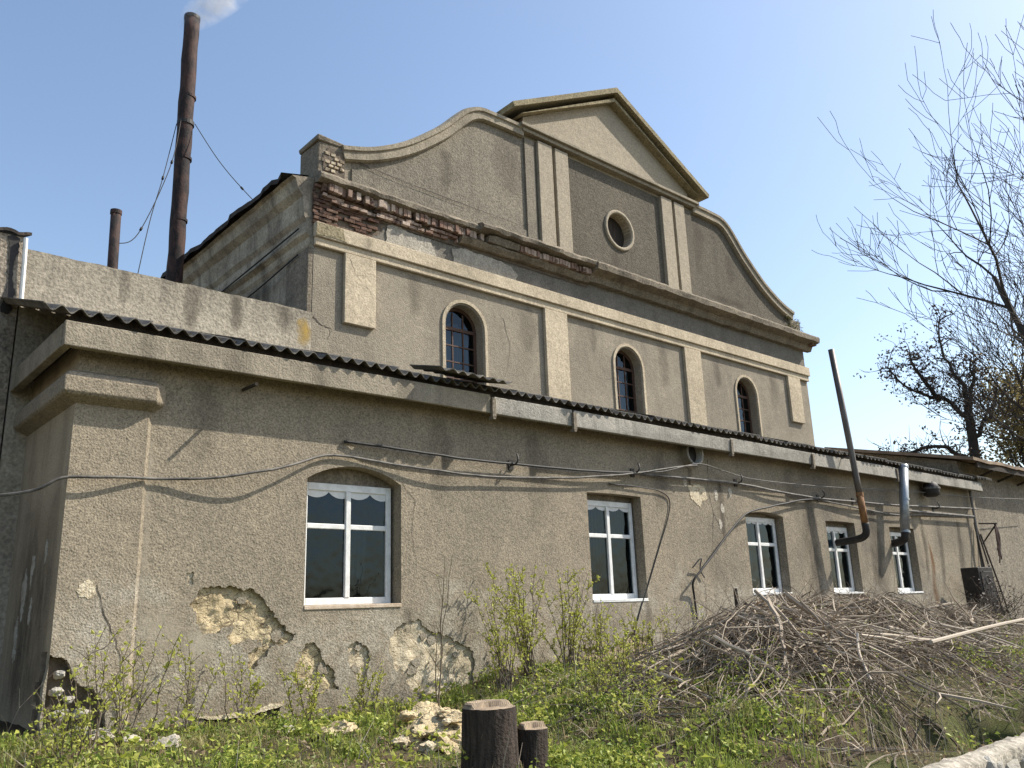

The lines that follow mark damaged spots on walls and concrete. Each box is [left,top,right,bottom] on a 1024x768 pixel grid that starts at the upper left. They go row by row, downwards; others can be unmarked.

flaking render [312,182,592,287]
peeling [683,479,732,530]
flaking render [30,652,103,736]
peeling [76,579,96,599]
crack [83,585,126,700]
flaking render [187,572,294,669]
flaking render [293,643,337,694]
flaking render [347,641,369,684]
peeling [389,619,474,697]